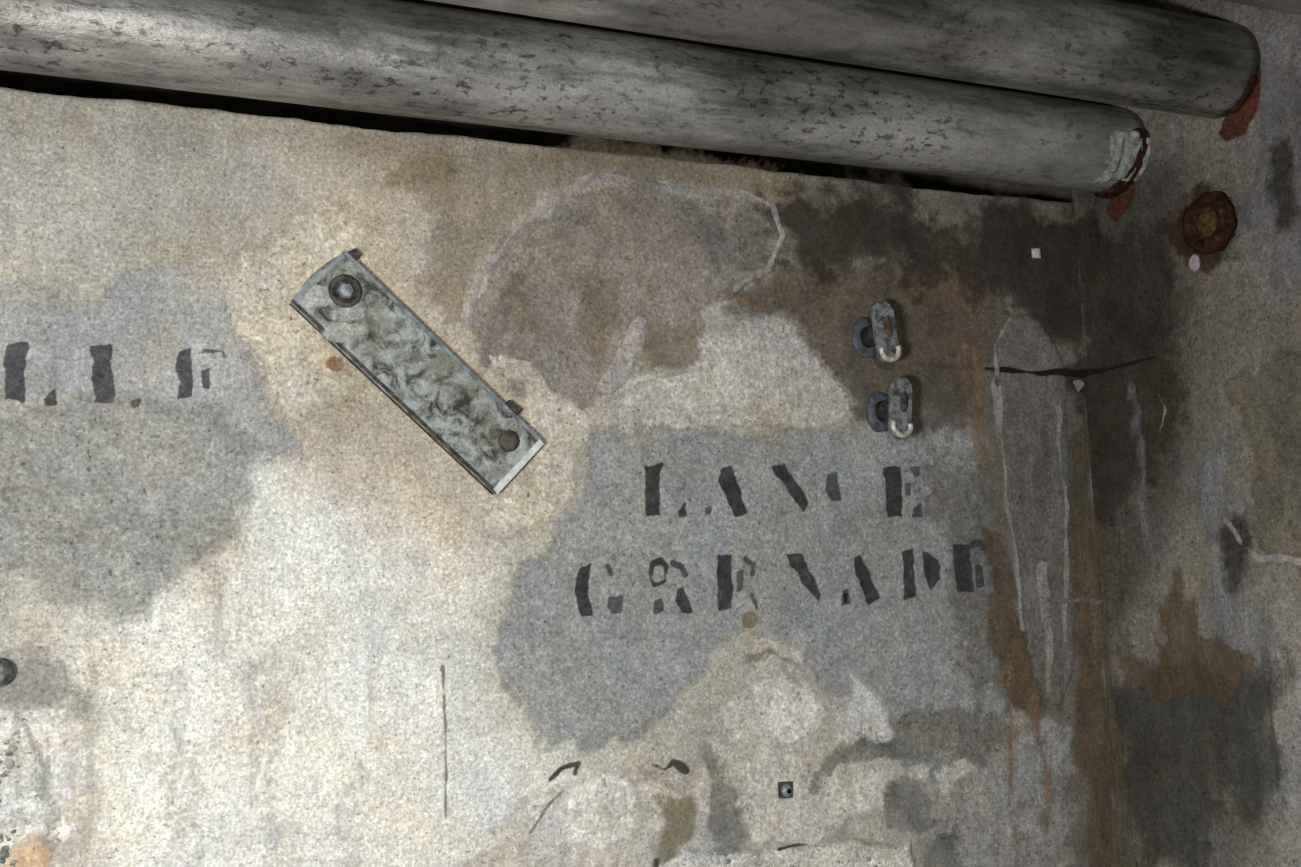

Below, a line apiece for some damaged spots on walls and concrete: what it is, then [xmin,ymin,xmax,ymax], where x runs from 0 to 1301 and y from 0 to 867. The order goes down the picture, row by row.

rust [1219,69,1261,141]
damp [735,169,1229,694]
crack [915,357,1155,392]
rust [985,531,1044,731]
damp [1111,443,1278,867]
peeling [23,704,77,867]